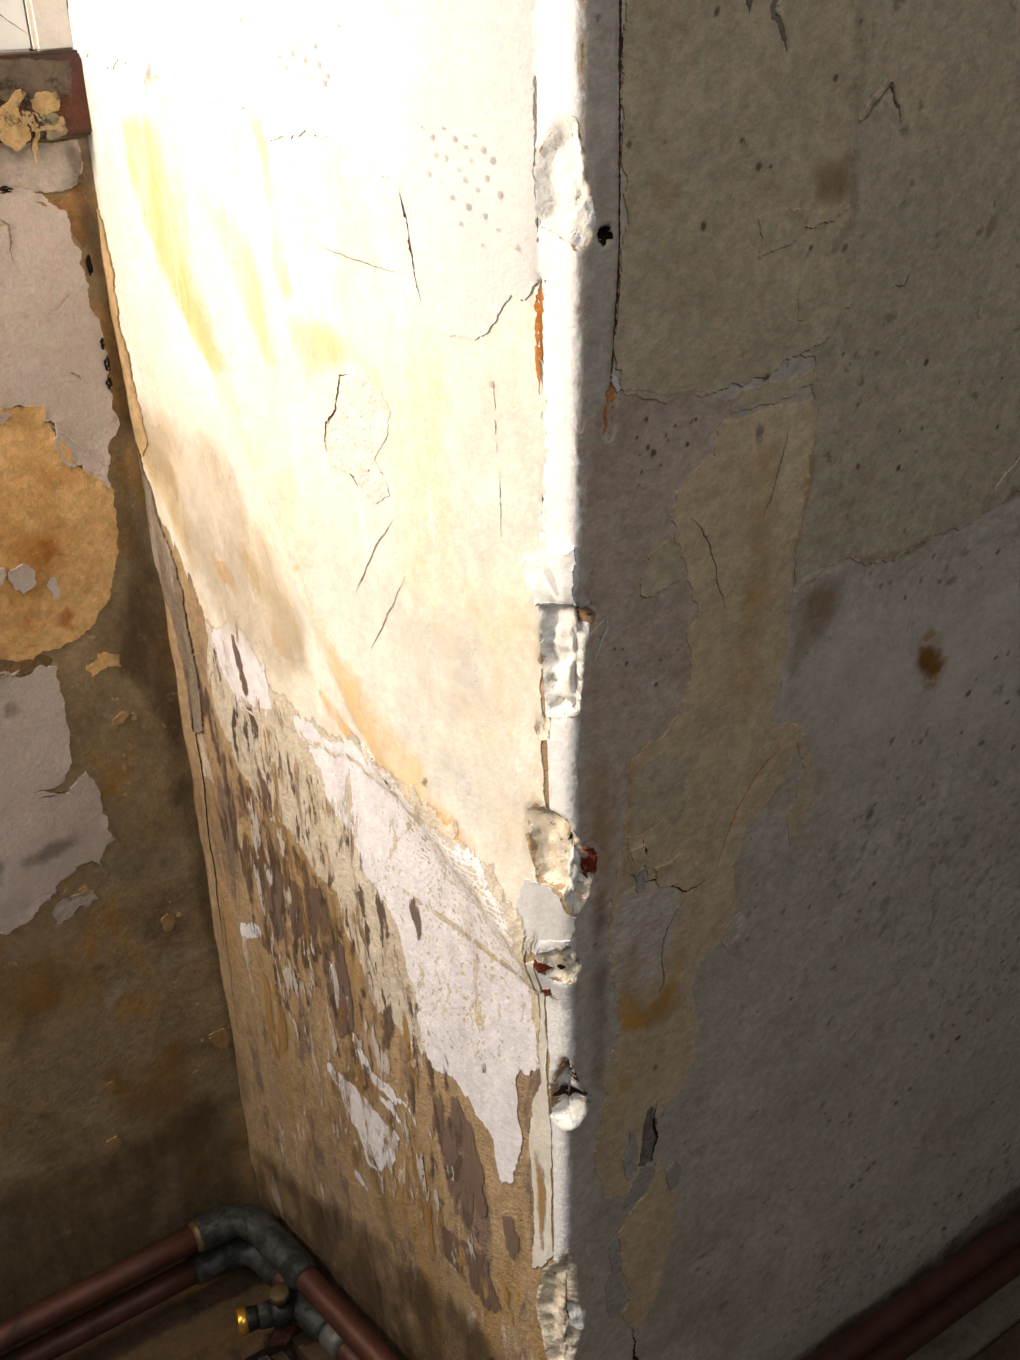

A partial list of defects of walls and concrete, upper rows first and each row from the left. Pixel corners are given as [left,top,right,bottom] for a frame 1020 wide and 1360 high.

water stain [145,126,216,365]
peeling [0,57,122,935]
rust [917,632,944,686]
peeling [277,827,286,858]
water stain [192,452,513,1324]
peeling [240,921,441,1222]
water stain [258,1166,494,1360]
peeling [438,1224,475,1273]
water stain [502,1215,519,1260]
water stain [534,1154,545,1249]
crack [632,1328,643,1360]